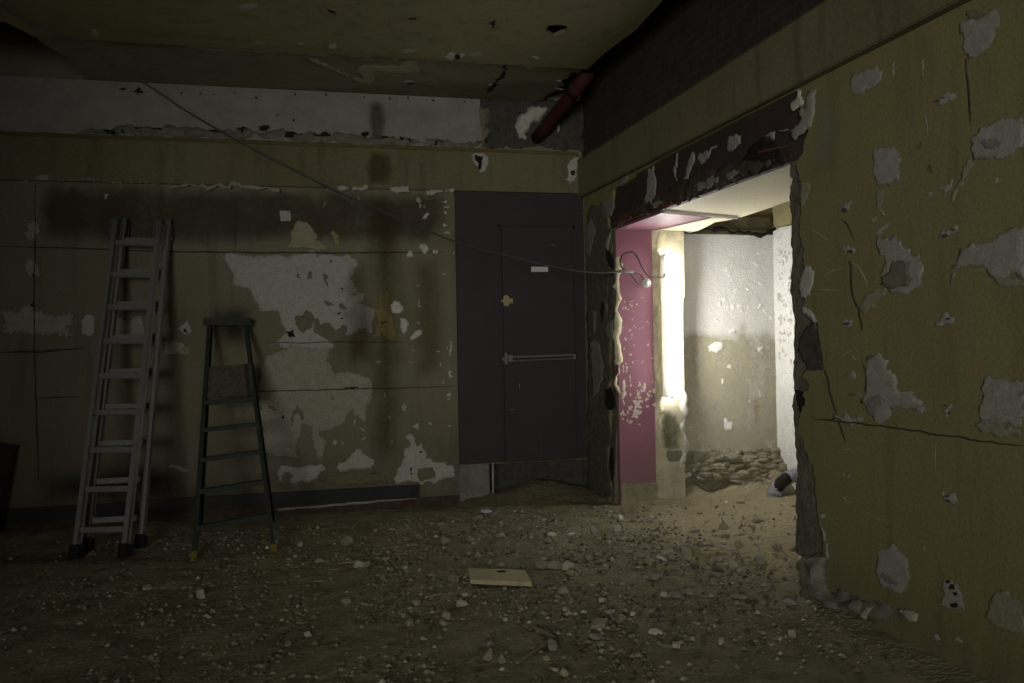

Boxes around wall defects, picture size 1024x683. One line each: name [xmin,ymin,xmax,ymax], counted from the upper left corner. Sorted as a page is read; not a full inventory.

spalling [77,80,584,188]
peeling [790,89,804,112]
peeling [218,211,455,489]
spalling [585,134,796,497]
peeling [708,250,817,363]
crack [814,370,1024,447]
spalling [796,505,919,627]